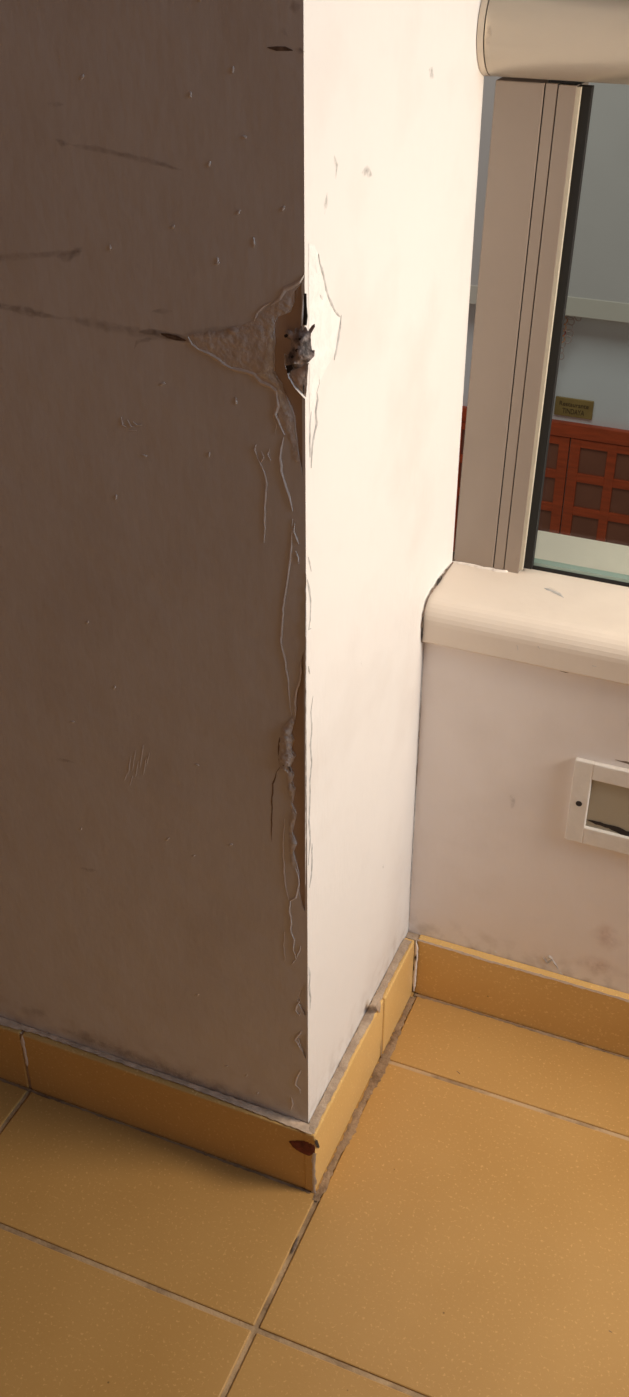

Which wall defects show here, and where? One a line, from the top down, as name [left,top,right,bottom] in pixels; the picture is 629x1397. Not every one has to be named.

spalling [161,243,342,512]
crack [253,445,313,888]
crack [306,969,314,1006]